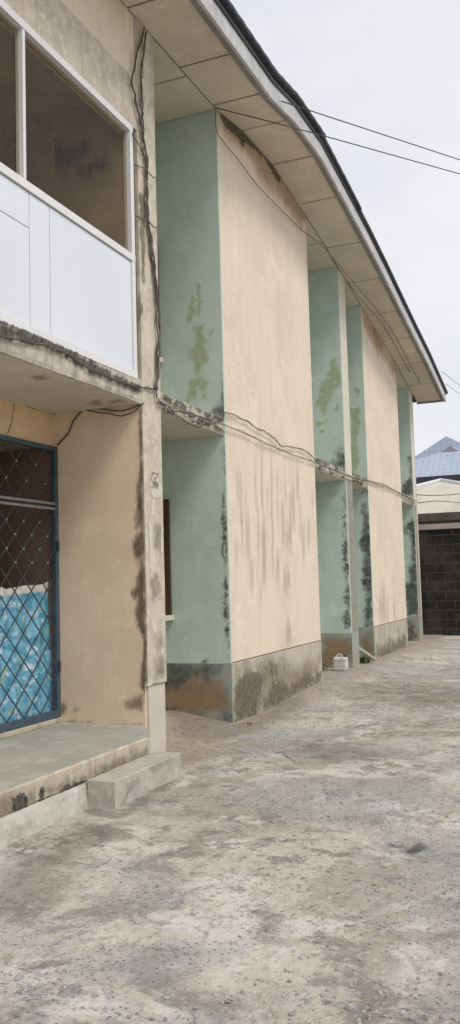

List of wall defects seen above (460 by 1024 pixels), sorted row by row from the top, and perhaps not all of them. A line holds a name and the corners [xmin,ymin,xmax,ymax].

water stain [220,113,281,183]
water stain [0,321,142,393]
peeling [162,282,226,474]
peeling [315,357,363,486]
water stain [127,412,147,708]
peeling [220,488,230,658]
water stain [360,513,373,626]
water stain [377,521,419,657]
water stain [165,663,210,688]
water stain [227,668,321,720]